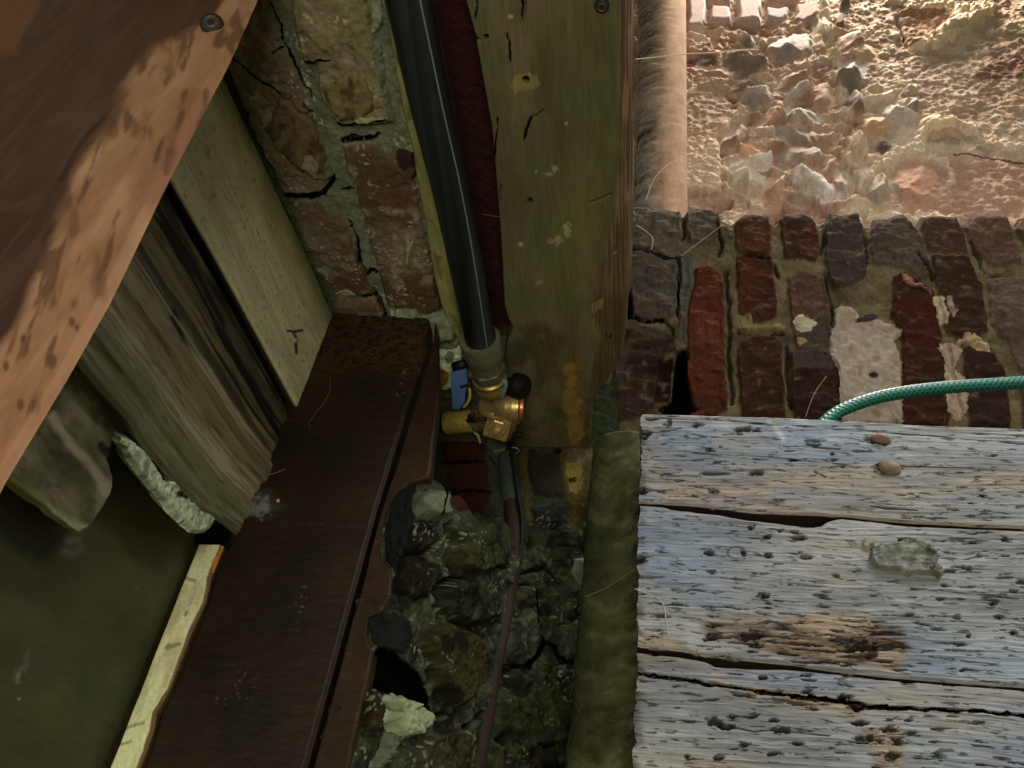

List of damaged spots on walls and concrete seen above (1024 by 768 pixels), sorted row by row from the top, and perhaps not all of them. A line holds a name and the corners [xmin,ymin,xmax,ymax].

crack [232,2,331,112]
crack [337,118,387,126]
crack [325,174,336,190]
crack [349,219,381,305]
peeling [946,295,959,317]
spalling [857,313,877,322]
peeling [938,332,990,422]